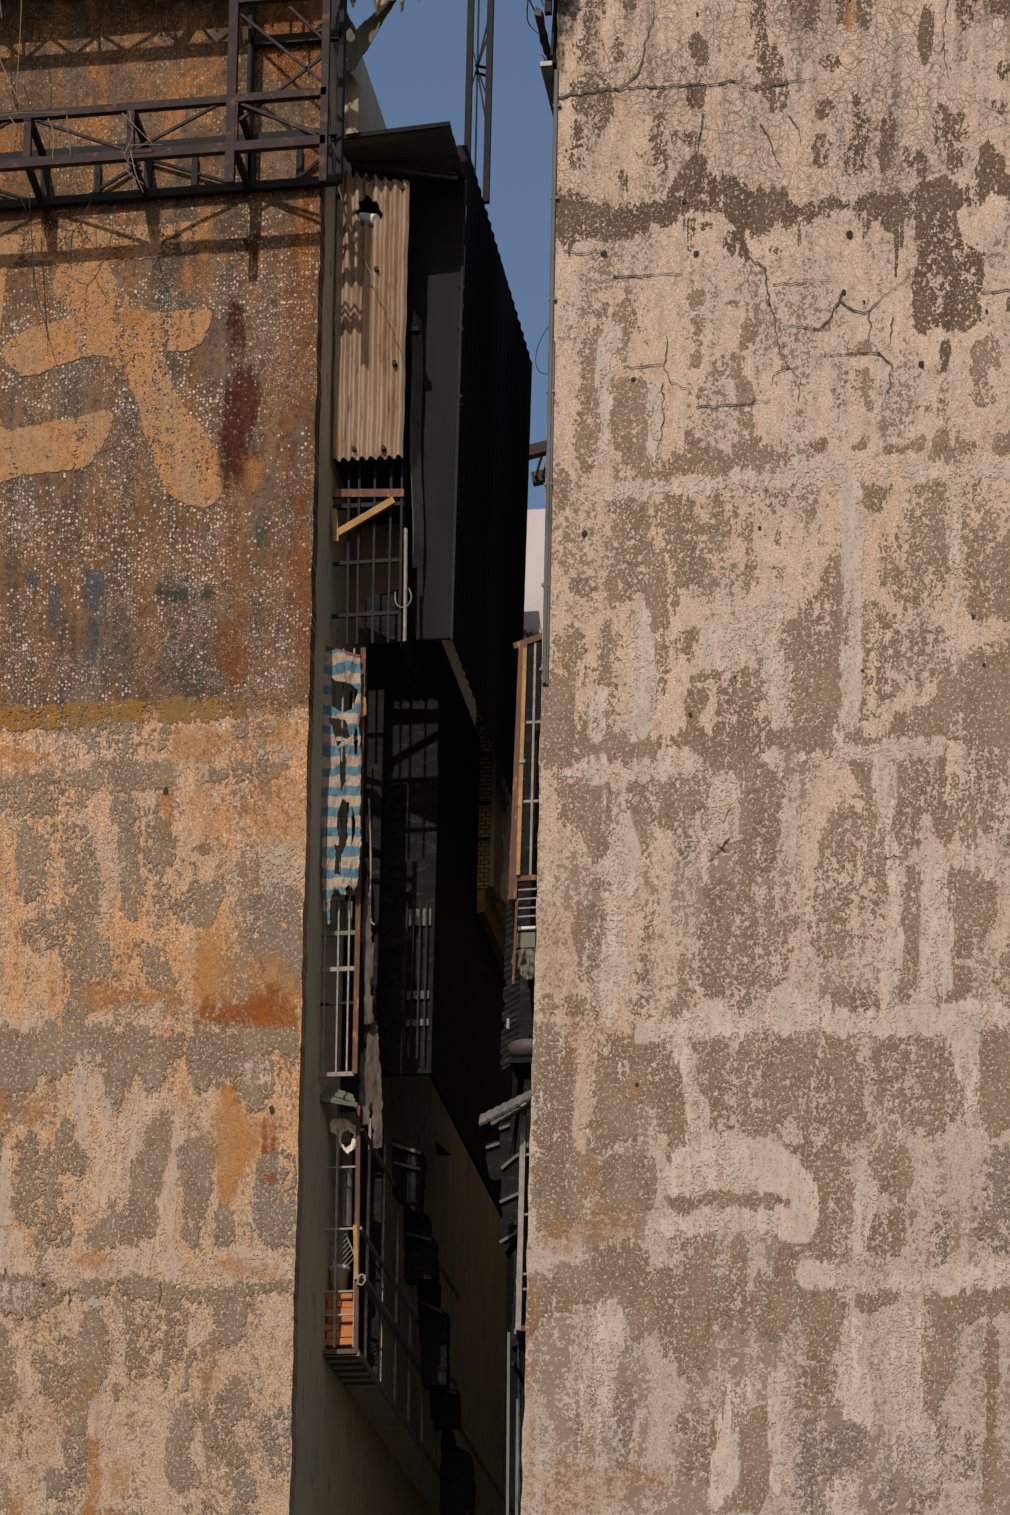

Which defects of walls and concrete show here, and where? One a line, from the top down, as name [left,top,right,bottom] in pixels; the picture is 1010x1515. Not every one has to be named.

crack [558,0,819,171]
corrosion [218,303,262,493]
crack [623,258,908,456]
corrosion [194,926,301,1027]